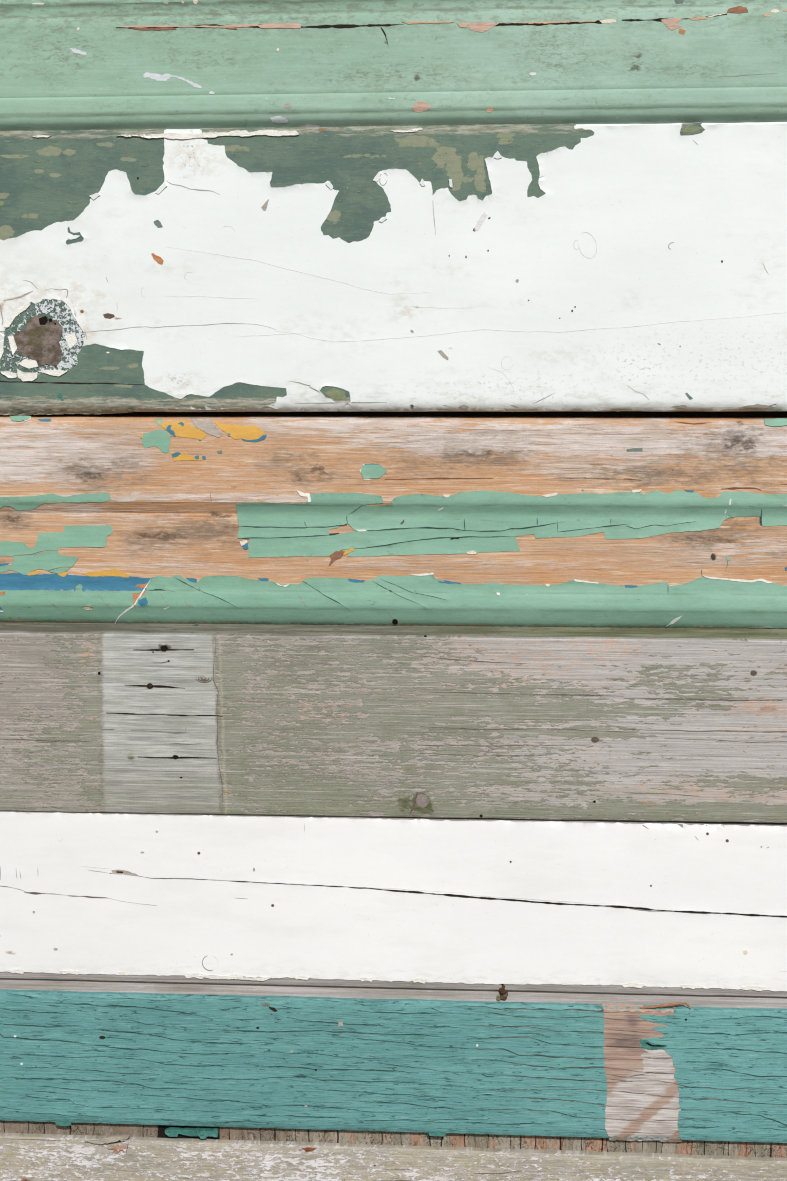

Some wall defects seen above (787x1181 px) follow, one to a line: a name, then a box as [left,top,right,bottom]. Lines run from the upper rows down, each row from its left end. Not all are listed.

peeling [0,107,594,245]
peeling [0,302,287,461]
peeling [320,386,351,404]
peeling [0,463,787,628]
crack [1,866,787,918]
peeling [184,973,271,981]
crack [0,994,663,1181]
peeling [467,1003,785,1142]
crack [662,1016,787,1158]